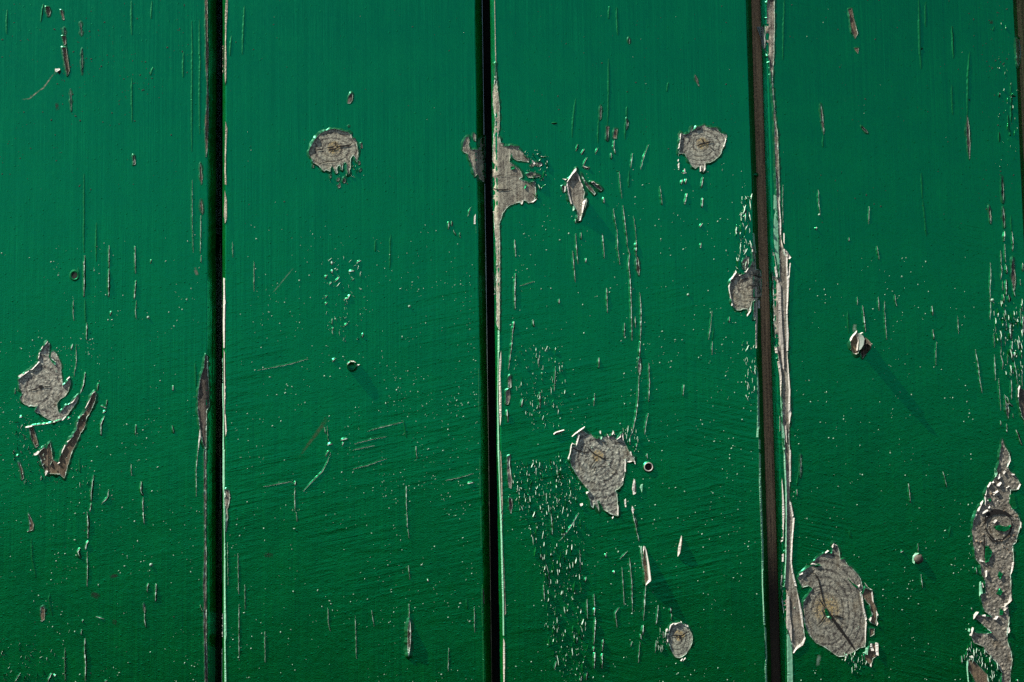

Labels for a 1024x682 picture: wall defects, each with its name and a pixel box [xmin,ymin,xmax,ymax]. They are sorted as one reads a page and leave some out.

peeling [307,124,363,189]
peeling [676,123,728,174]
peeling [13,340,99,485]
peeling [461,35,643,682]
peeling [727,0,880,682]
peeling [966,437,1023,682]
peeling [657,621,695,661]